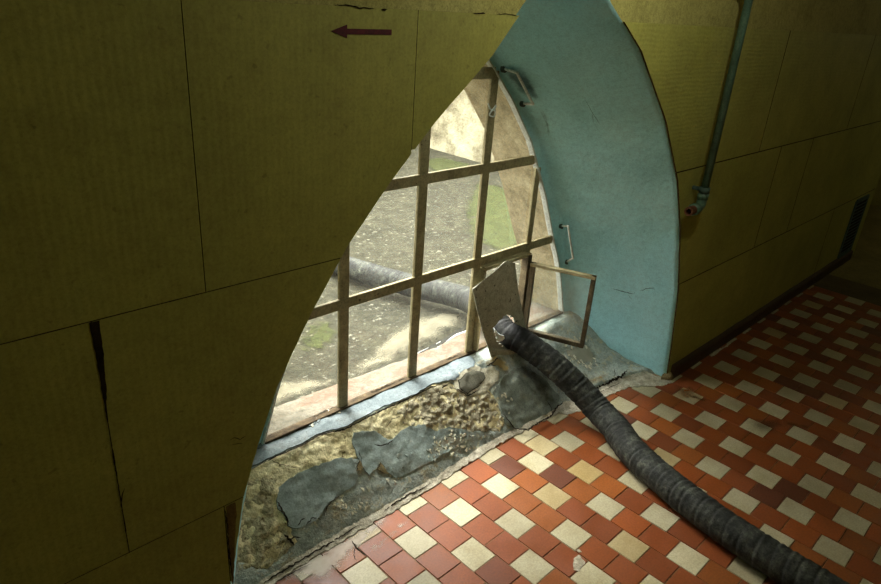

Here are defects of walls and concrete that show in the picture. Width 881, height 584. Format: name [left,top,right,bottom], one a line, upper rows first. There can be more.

crack [89,320,129,548]
spalling [236,355,560,569]
crack [597,369,627,389]